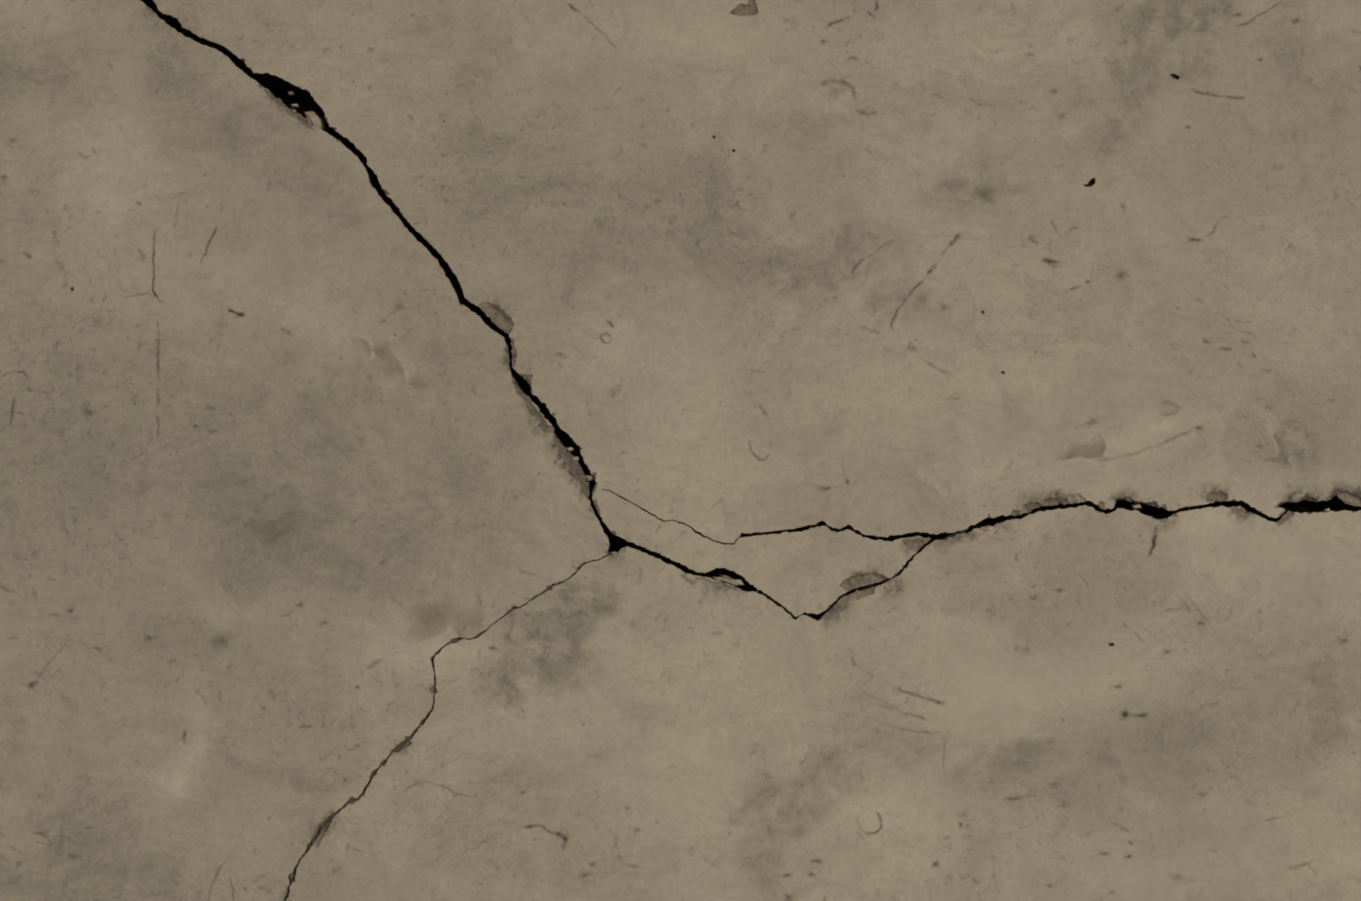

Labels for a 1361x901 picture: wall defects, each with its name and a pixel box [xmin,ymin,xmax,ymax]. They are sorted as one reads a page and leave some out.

crack [141,0,596,481]
crack [283,431,1361,901]